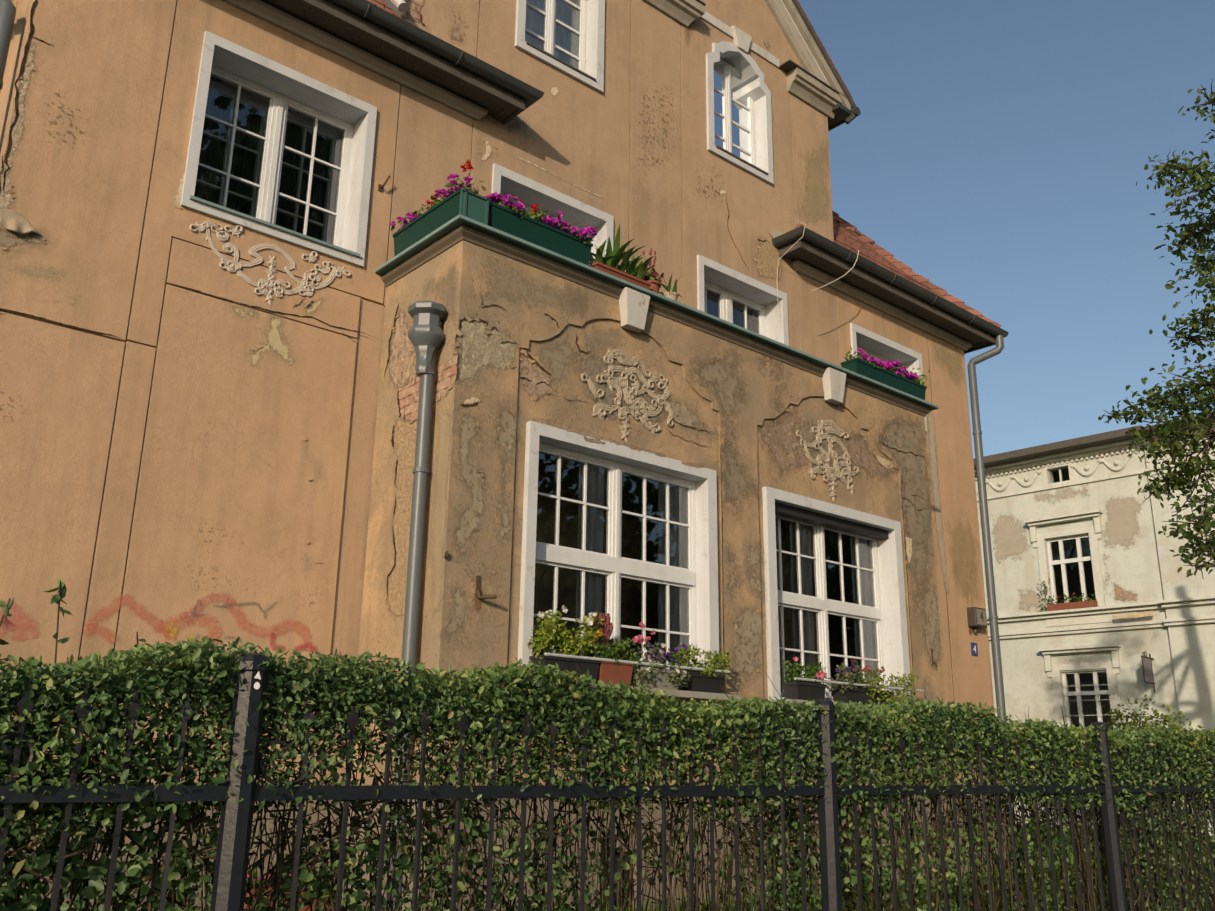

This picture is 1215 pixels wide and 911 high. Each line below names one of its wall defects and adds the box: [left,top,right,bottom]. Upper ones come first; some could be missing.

crack [0,0,52,191]
crack [0,308,119,338]
peeling [249,315,294,365]
spalling [389,311,553,424]
spalling [928,413,949,593]
peeling [993,515,1027,563]
peeling [1102,497,1141,558]
flaking render [1106,575,1155,619]